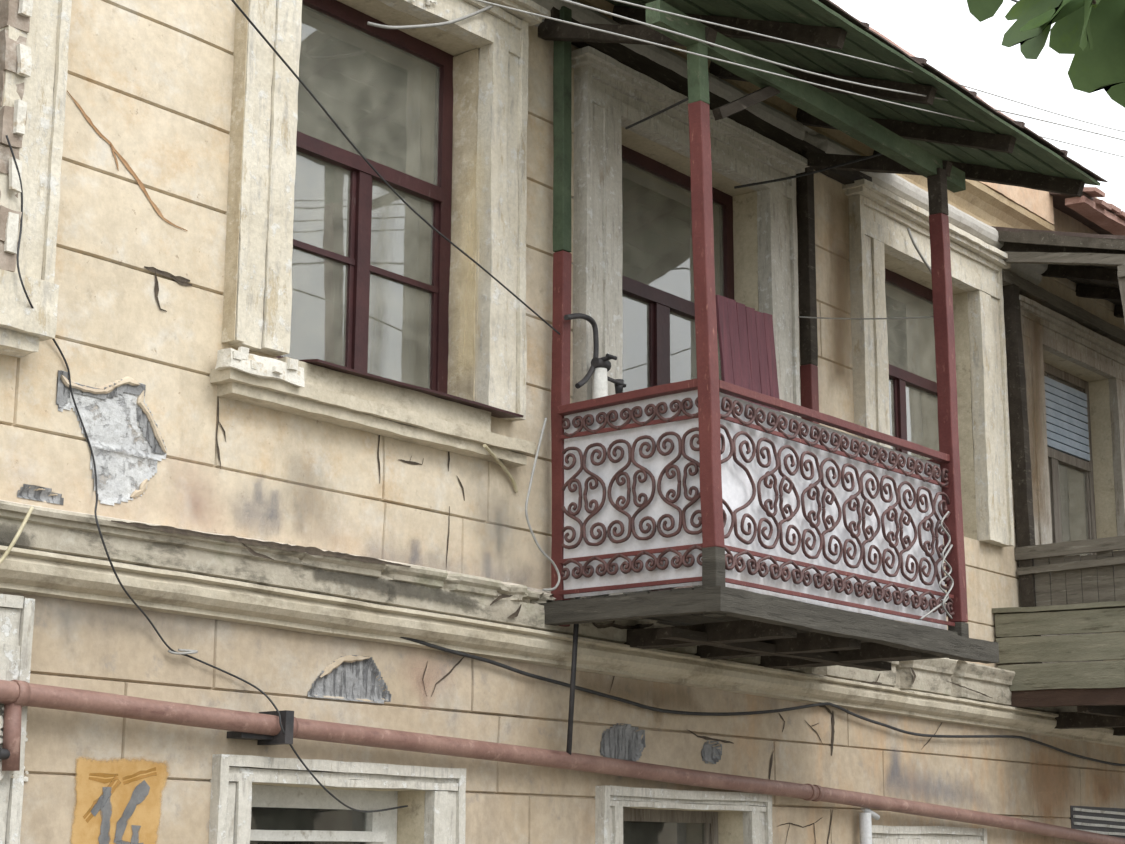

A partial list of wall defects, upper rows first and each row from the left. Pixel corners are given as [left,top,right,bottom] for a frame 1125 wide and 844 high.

crack [67,91,188,231]
crack [144,266,192,312]
peeling [56,370,167,506]
crack [216,398,226,469]
peeling [17,484,64,505]
leakage [0,524,30,549]
leakage [315,569,477,605]
spalling [308,655,391,704]
spalling [600,723,646,762]
spalling [701,740,722,764]
crack [779,810,833,844]